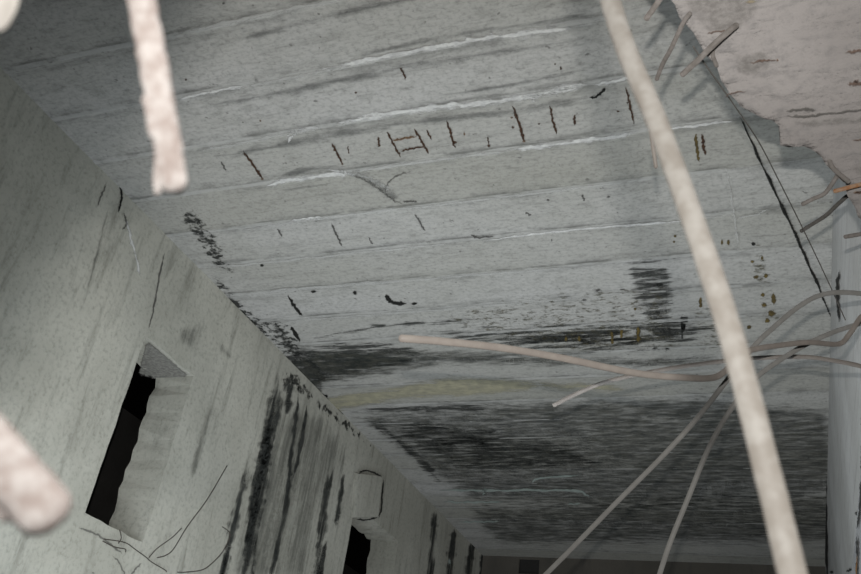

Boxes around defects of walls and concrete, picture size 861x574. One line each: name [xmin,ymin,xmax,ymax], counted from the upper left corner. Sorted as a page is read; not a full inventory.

spalling [655,11,692,81]
spalling [680,23,739,77]
rust [377,129,432,156]
spalling [800,159,861,233]
water stain [184,213,443,273]
water stain [492,221,681,240]
crack [149,253,165,326]
spalling [139,343,186,379]
water stain [217,262,767,574]
crack [358,470,384,521]
water stain [766,411,828,539]
crack [81,528,140,574]